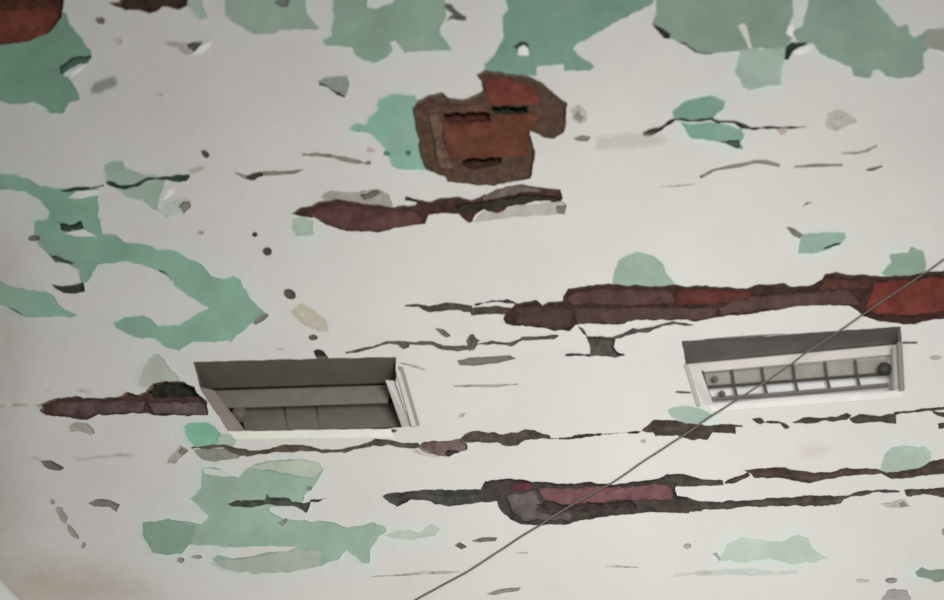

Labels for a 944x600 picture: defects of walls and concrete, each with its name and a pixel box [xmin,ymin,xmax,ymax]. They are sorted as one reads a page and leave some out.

peeling [0,0,92,114]
peeling [224,0,451,63]
spalling [292,0,944,236]
crack [643,118,806,136]
spalling [503,247,944,331]
crack [345,299,693,370]
peeling [0,161,440,575]
crack [191,439,419,457]
crack [460,407,944,446]
spalling [483,478,693,525]
peeling [881,499,911,508]